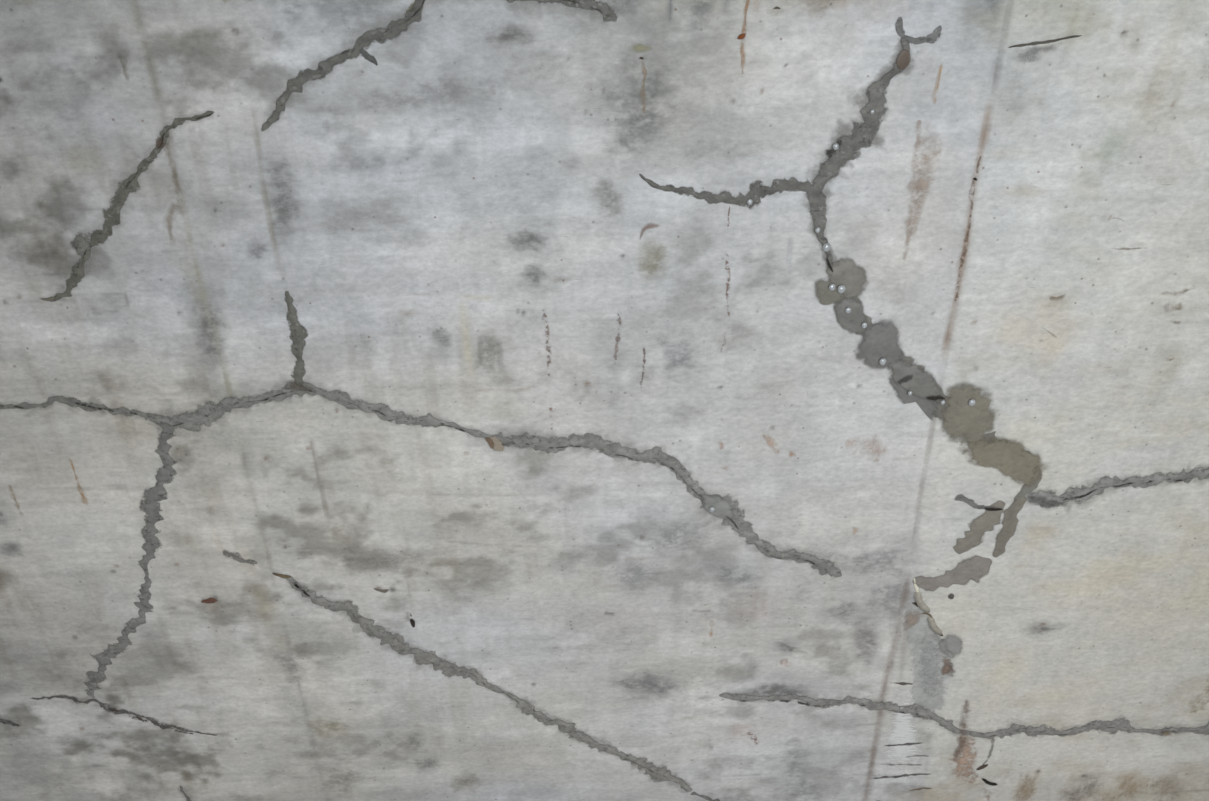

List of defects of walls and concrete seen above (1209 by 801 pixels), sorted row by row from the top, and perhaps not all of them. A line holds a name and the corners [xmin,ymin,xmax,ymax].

crack [262,0,425,131]
crack [507,0,617,21]
crack [41,111,214,302]
crack [639,17,1209,599]
crack [0,291,842,736]
crack [223,551,720,801]
crack [719,687,1209,786]